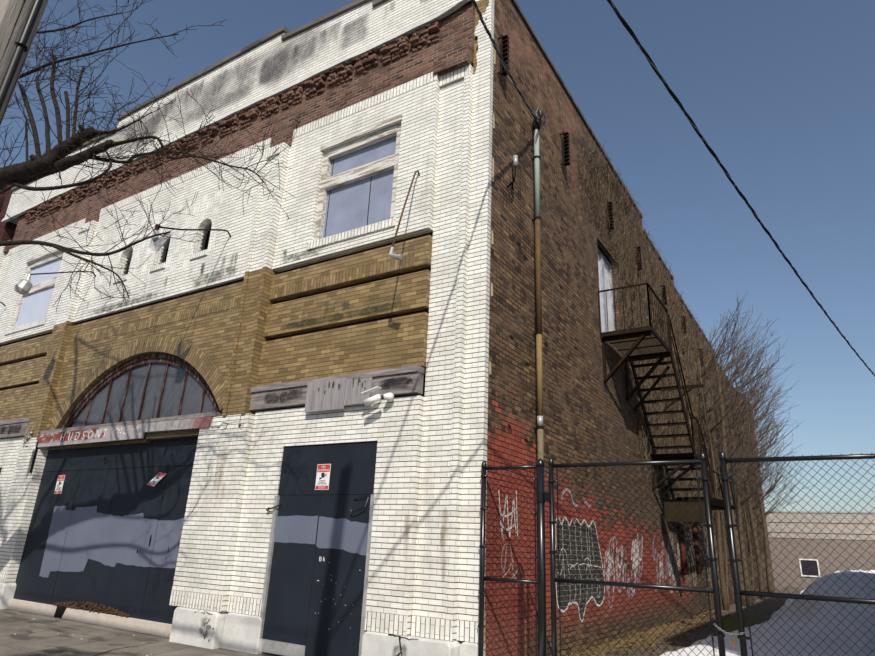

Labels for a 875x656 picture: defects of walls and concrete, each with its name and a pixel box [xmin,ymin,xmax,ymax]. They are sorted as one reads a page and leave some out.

crack [388,634,411,656]